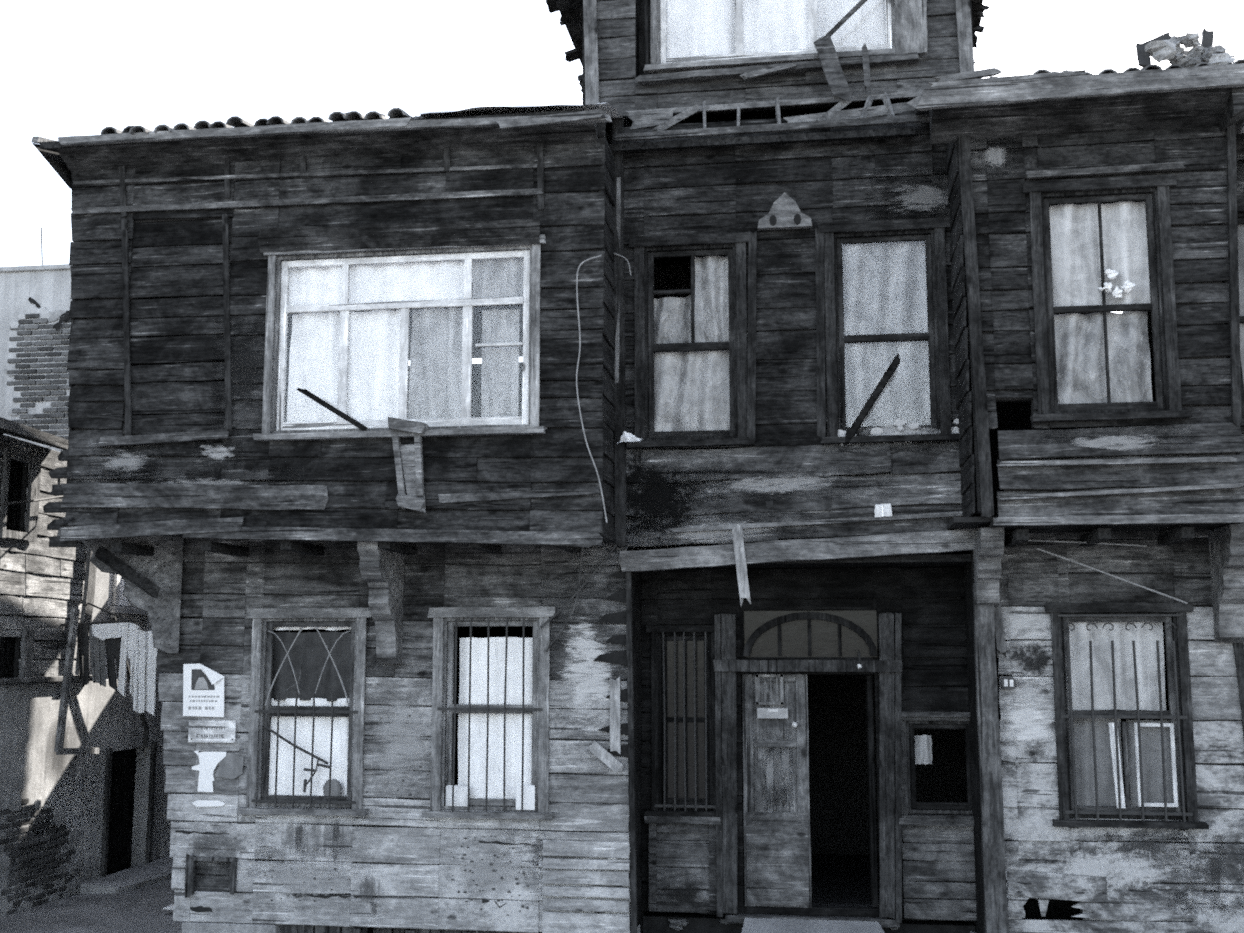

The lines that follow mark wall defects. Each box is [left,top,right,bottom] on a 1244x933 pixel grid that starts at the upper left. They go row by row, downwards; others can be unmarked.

spalling [4,306,71,448]
spalling [0,791,84,915]
water stain [1118,840,1160,858]
water stain [1198,835,1244,893]